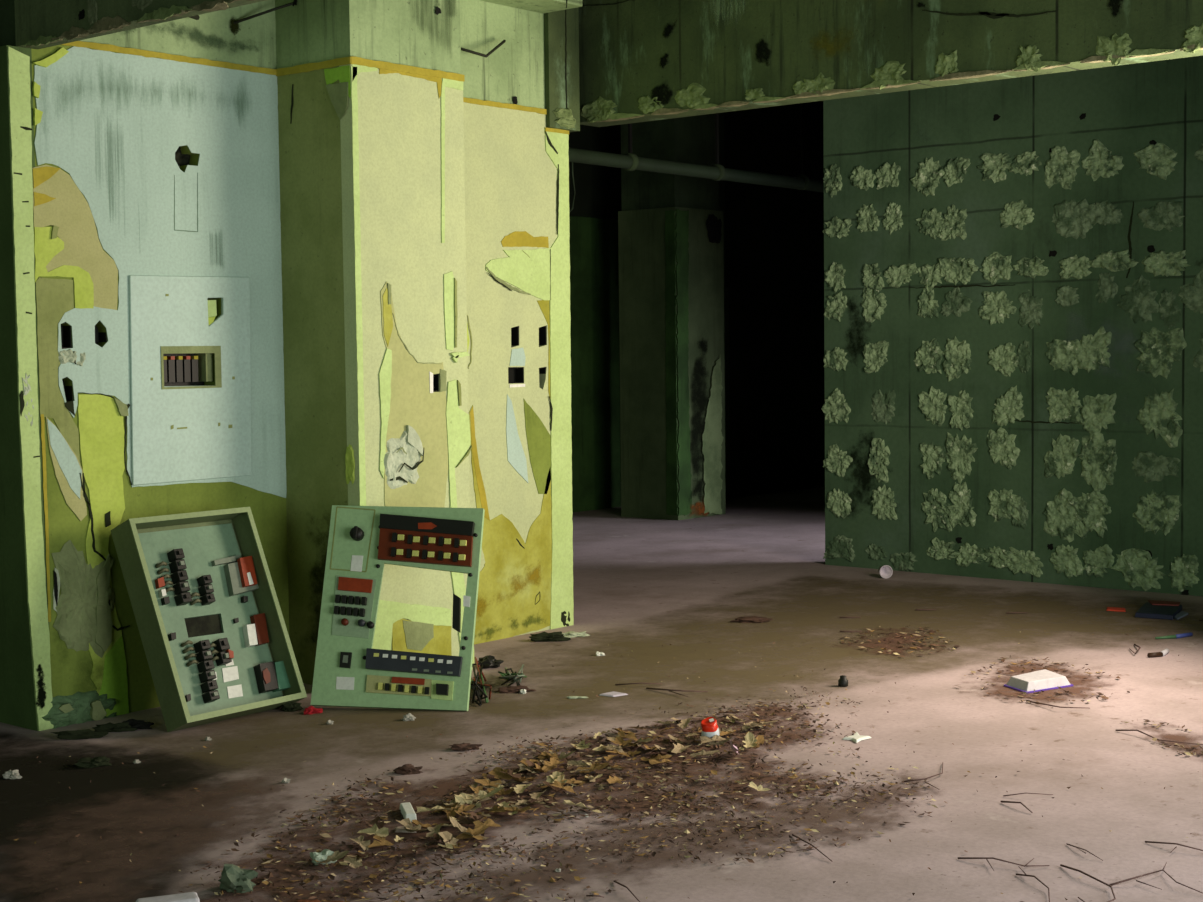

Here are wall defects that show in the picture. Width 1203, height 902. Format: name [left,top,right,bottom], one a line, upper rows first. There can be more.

peeling [324,64,463,243]
damp [649,84,672,105]
damp [755,39,771,66]
crack [922,10,1057,19]
peeling [14,0,287,729]
peeling [372,271,570,666]
peeling [485,231,551,397]
damp [691,340,709,501]
damp [847,300,864,357]
damp [849,437,882,512]